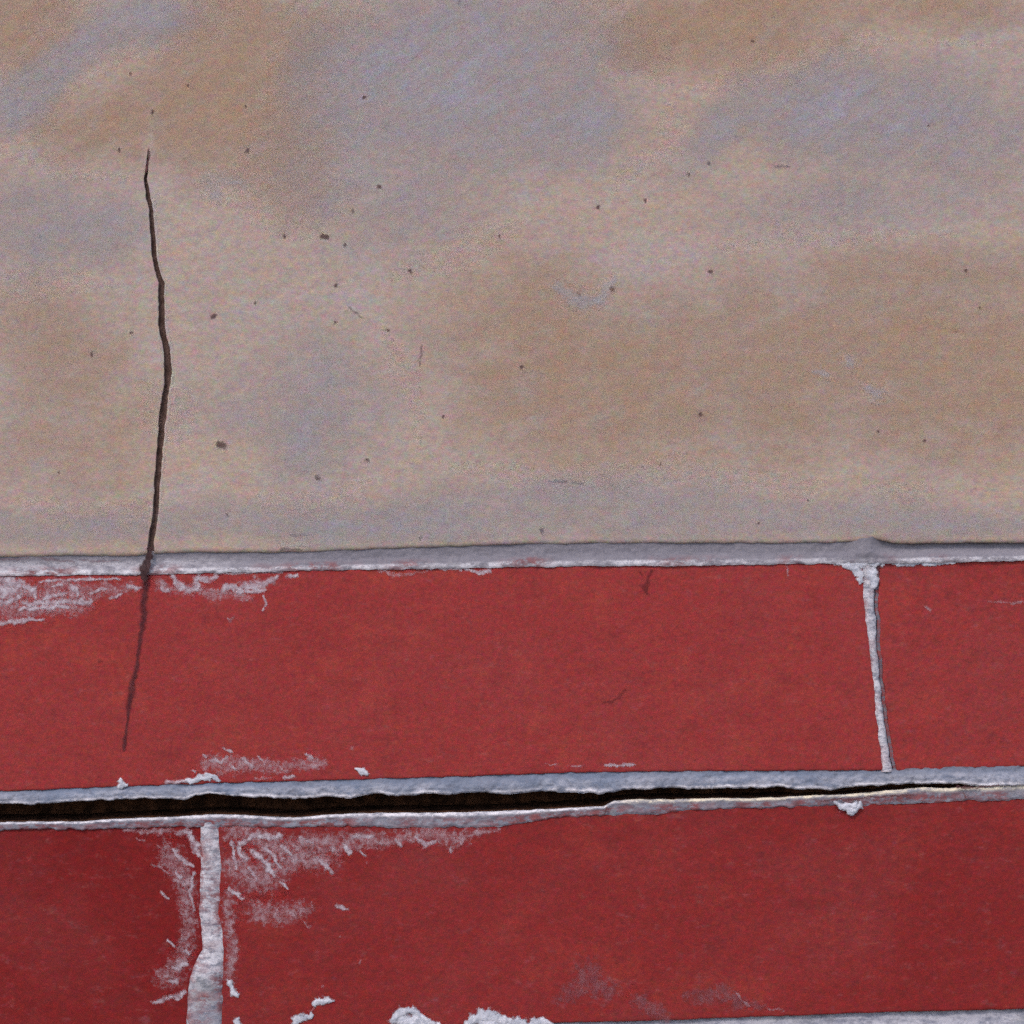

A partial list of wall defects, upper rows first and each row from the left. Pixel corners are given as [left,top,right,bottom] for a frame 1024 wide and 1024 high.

crack [123,148,172,751]
crack [0,783,1000,822]
efflorescence [173,829,201,914]
efflorescence [230,830,374,889]
efflorescence [154,939,189,1004]